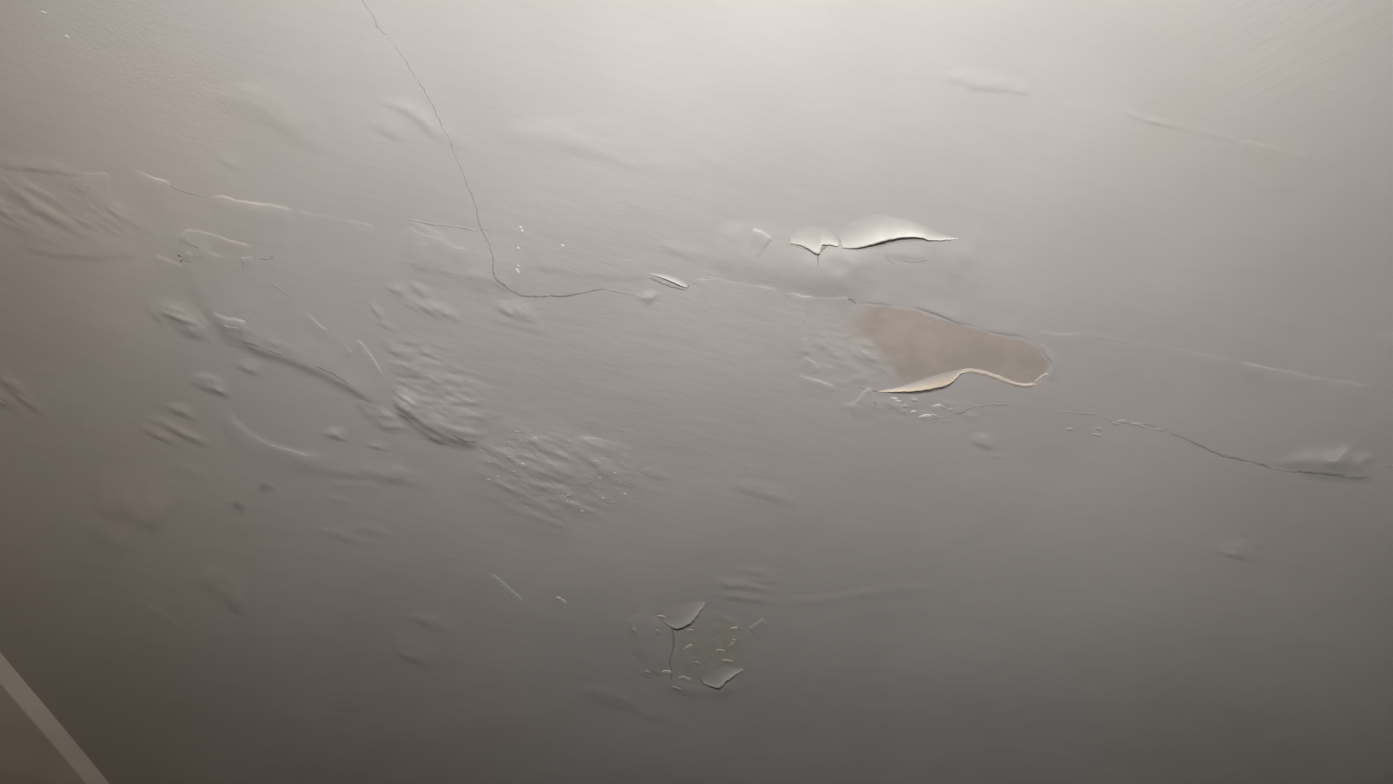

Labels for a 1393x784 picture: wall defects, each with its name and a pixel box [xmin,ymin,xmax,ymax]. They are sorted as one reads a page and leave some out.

crack [362,0,646,299]
peeling [788,215,960,265]
peeling [839,284,1064,424]
crack [1056,411,1320,474]